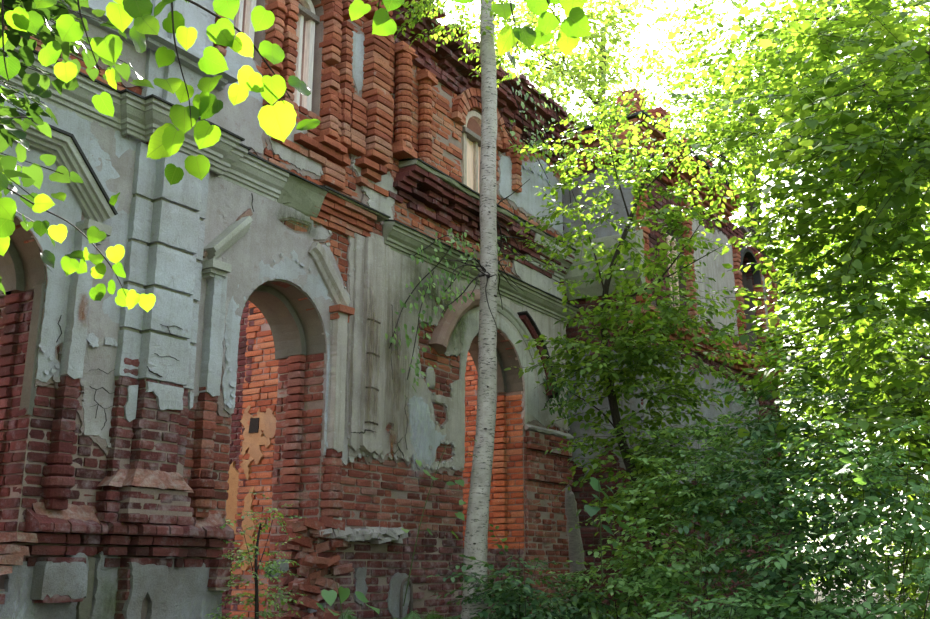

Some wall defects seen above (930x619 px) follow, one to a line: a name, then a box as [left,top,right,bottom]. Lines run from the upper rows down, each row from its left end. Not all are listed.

spalling [273,155,324,185]
spalling [21,343,63,508]
spalling [68,421,112,506]
peeling [86,332,118,348]
crack [89,368,116,430]
spalling [209,357,236,518]
spalling [418,320,460,429]
spalling [280,440,464,619]